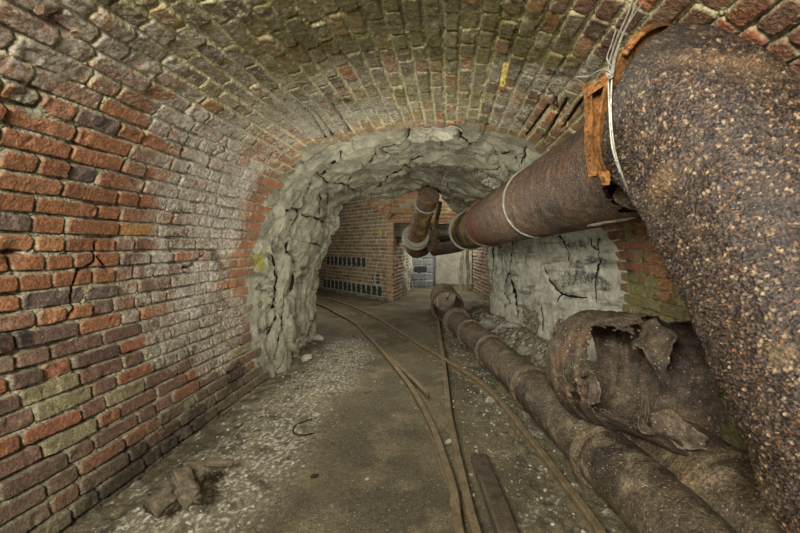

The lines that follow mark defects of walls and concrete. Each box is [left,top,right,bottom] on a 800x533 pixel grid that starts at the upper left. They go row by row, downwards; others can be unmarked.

crack [377,155,424,187]
crack [266,96,411,360]
crack [67,242,107,316]
crack [492,242,519,318]
crack [541,238,601,332]